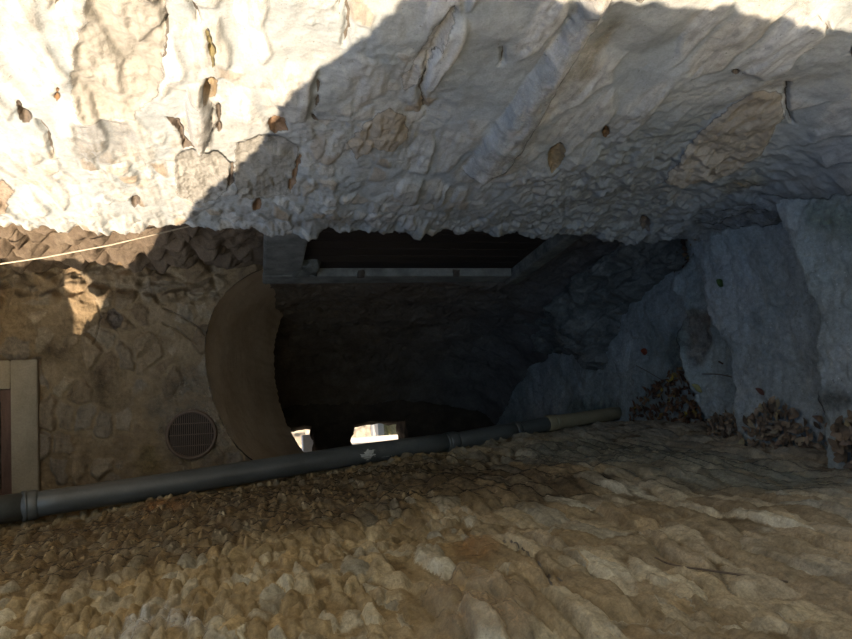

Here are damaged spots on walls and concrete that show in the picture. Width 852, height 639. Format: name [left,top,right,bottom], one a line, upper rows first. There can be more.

spalling [69,0,167,164]
spalling [167,115,302,210]
spalling [346,108,408,159]
spalling [665,90,785,189]